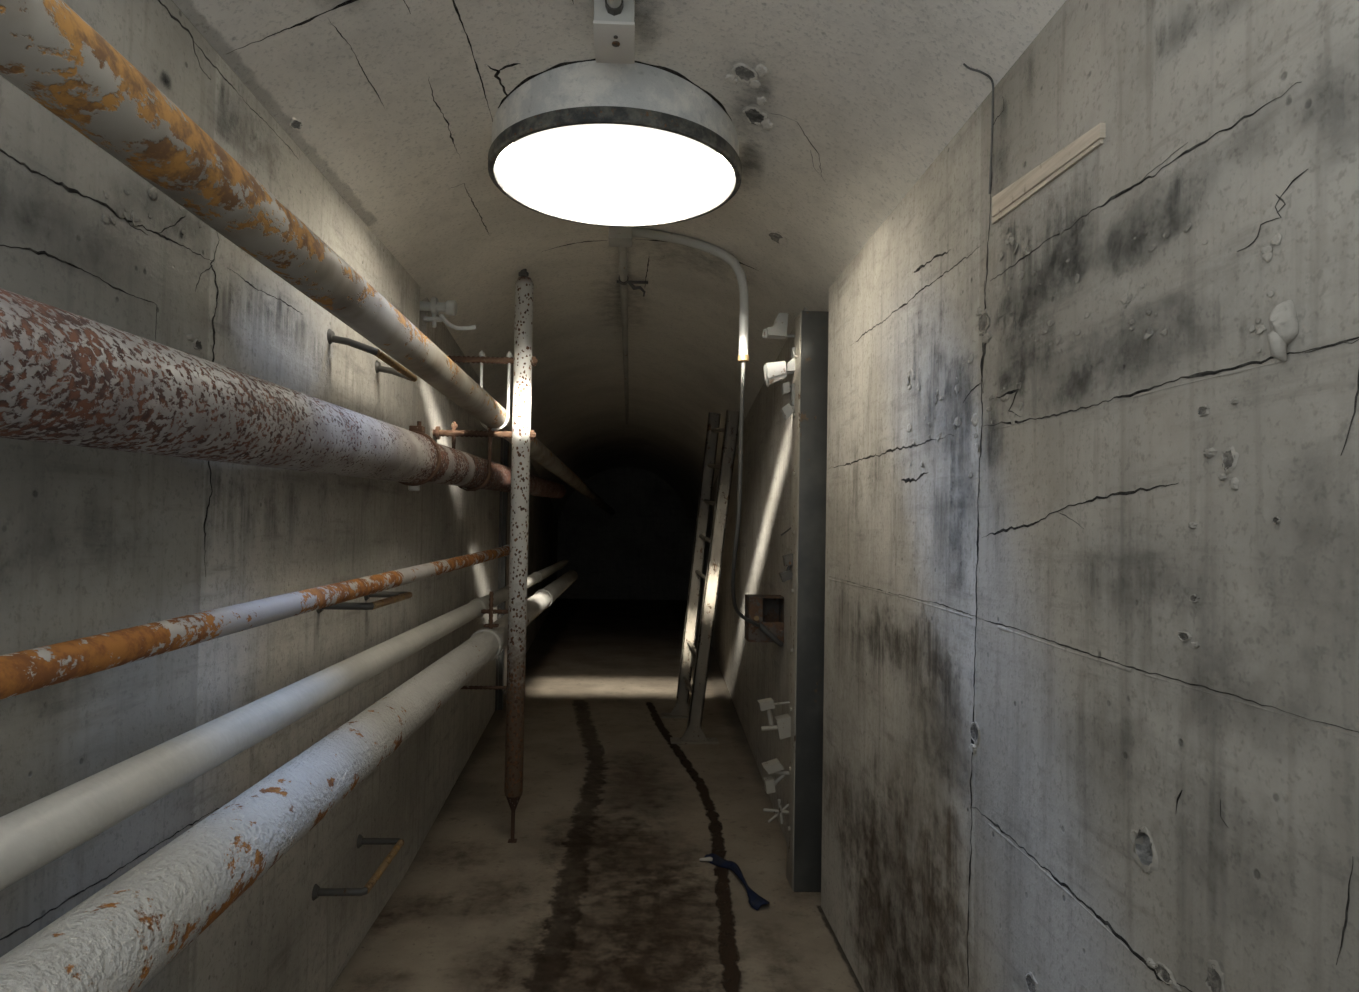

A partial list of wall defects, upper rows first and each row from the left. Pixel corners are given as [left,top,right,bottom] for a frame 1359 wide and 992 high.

crack [158,0,384,160]
crack [428,80,489,234]
crack [452,0,596,122]
crack [635,61,732,120]
crack [0,149,299,362]
crack [545,239,691,286]
crack [203,461,213,573]
crack [828,82,1359,992]
water stain [609,702,741,992]
water stain [818,906,861,992]